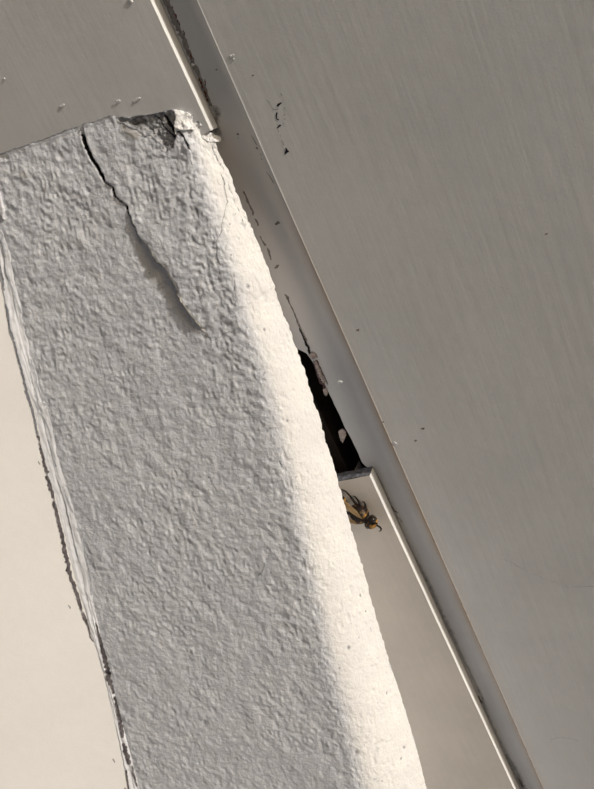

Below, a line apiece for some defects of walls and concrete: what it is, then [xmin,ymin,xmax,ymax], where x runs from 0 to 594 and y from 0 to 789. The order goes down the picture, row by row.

crack [0,115,228,341]
flaking render [116,110,221,152]
crack [0,266,138,789]